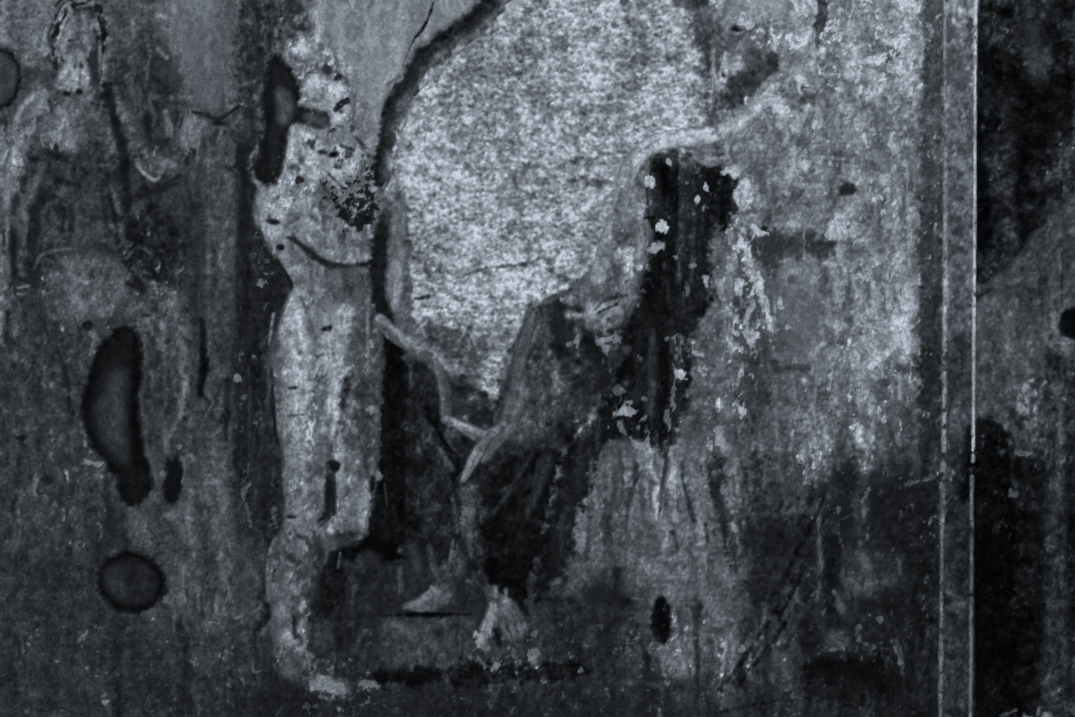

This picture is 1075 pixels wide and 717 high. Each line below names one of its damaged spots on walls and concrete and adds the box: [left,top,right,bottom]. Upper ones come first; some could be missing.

water stain [236,0,303,166]
crack [406,2,434,56]
peeling [244,232,277,309]
flaking render [255,0,948,505]
peeling [233,374,248,410]
peeling [268,464,382,540]
peeling [651,208,936,691]
peeling [882,444,980,561]